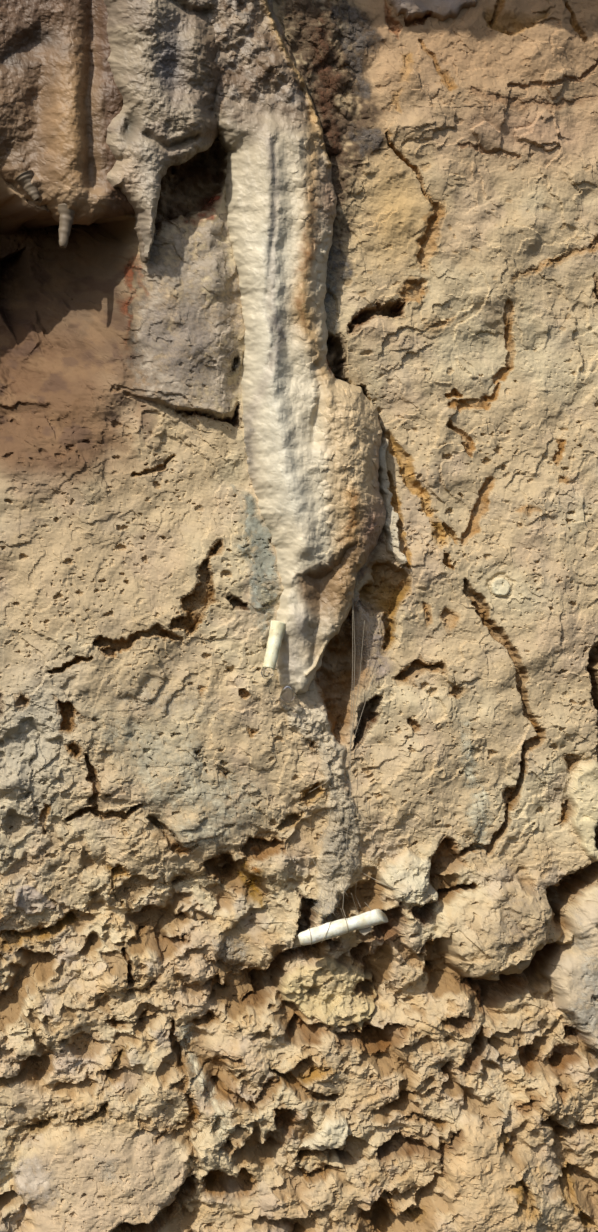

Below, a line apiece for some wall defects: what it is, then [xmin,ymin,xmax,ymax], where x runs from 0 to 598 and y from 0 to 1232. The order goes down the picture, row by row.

crack [417,0,598,117]
leakage [275,0,383,329]
crack [165,400,244,430]
crack [326,138,598,858]
crack [37,537,252,857]
spalling [163,779,328,889]
spalling [13,864,193,1136]
spalling [112,1136,260,1232]
spalling [204,1009,471,1186]
spalling [186,833,579,1079]
spalling [357,1187,432,1232]
spalling [510,1022,598,1142]